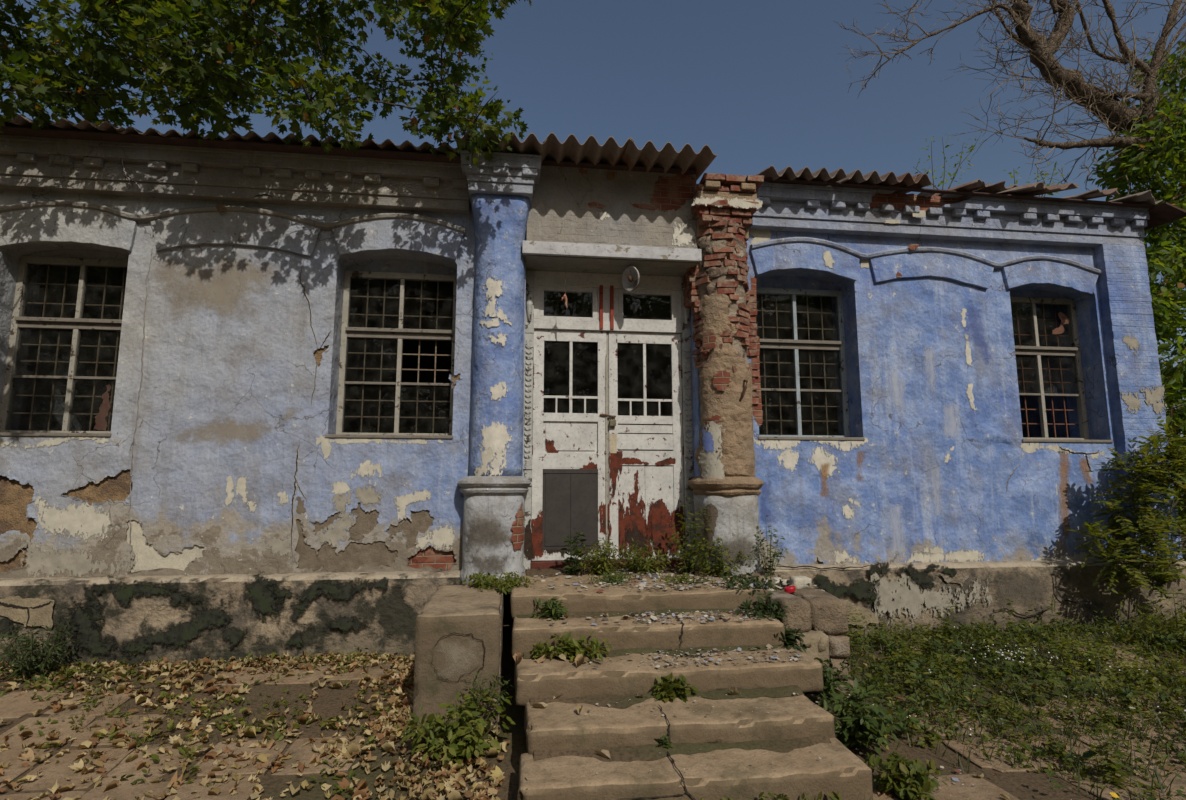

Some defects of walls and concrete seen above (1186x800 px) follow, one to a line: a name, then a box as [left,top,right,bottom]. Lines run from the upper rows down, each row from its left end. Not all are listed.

peeling [630,174,697,248]
crack [299,257,329,406]
peeling [480,275,512,346]
peeling [0,437,121,450]
peeling [316,434,444,459]
peeling [0,469,207,577]
peeling [262,460,458,573]
peeling [842,497,861,519]
leakage [0,618,19,635]
leakage [27,568,389,659]
crack [617,705,696,800]